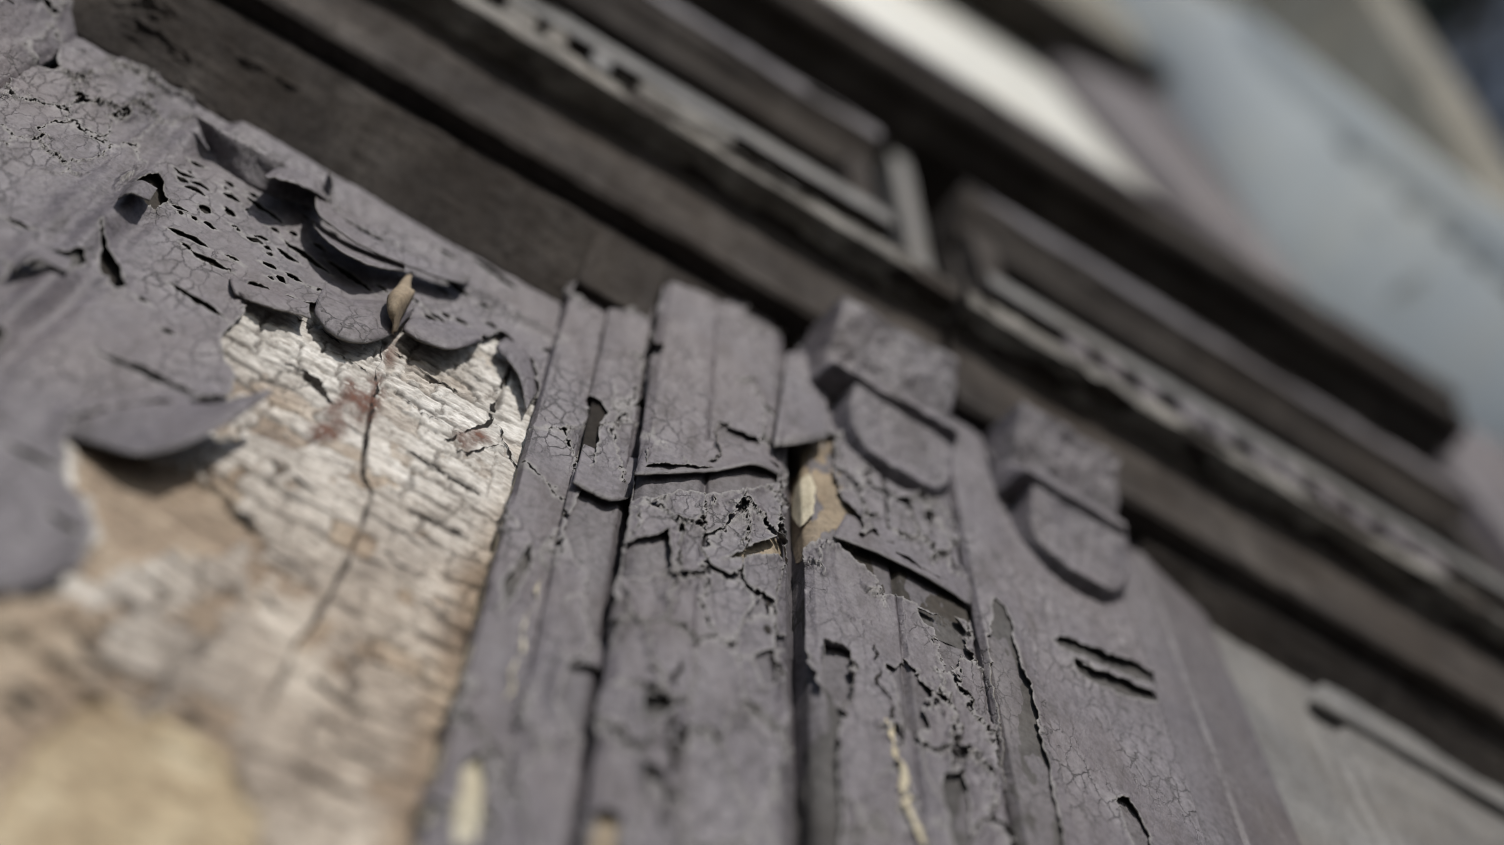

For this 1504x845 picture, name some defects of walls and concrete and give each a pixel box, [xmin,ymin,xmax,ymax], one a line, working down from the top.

crack [100,221,125,289]
crack [425,251,536,328]
peeling [0,115,539,845]
crack [171,171,517,719]
peeling [556,351,972,747]
peeling [590,808,622,845]
peeling [795,677,853,845]
peeling [940,773,977,845]
peeling [990,599,1063,845]